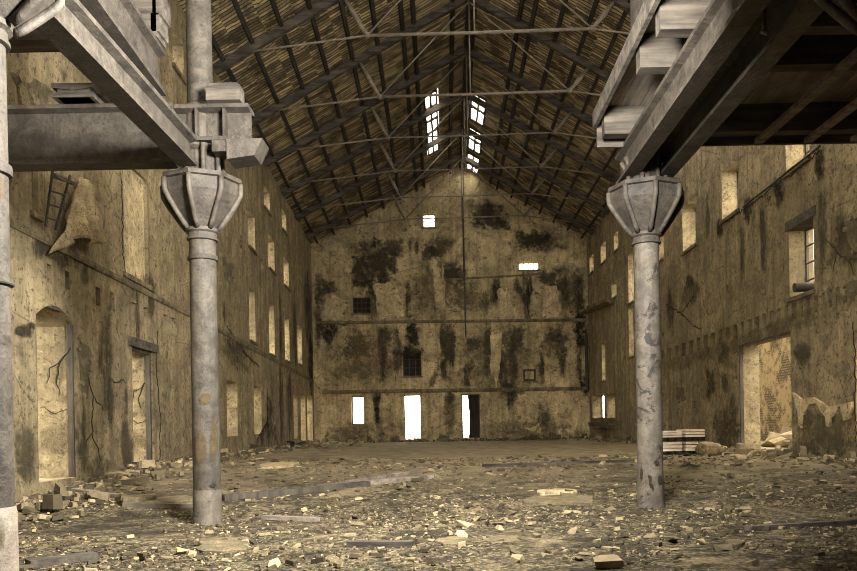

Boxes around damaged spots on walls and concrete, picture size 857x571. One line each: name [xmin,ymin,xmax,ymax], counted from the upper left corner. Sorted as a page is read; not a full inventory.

water stain [350,237,403,321]
water stain [405,237,590,410]
crack [44,348,70,414]
crack [84,331,161,460]
water stain [330,327,403,441]
water stain [444,392,455,433]
peeling [792,392,854,428]